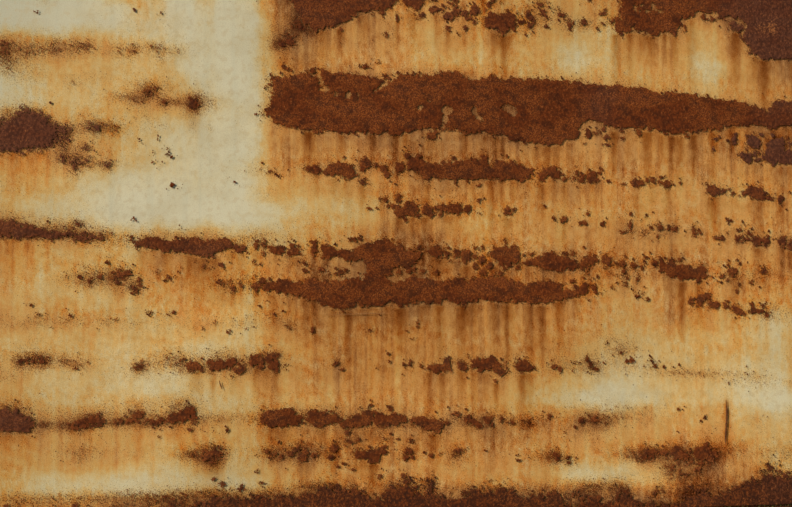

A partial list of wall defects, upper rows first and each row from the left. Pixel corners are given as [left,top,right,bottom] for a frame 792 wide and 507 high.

corrosion [0,0,792,398]